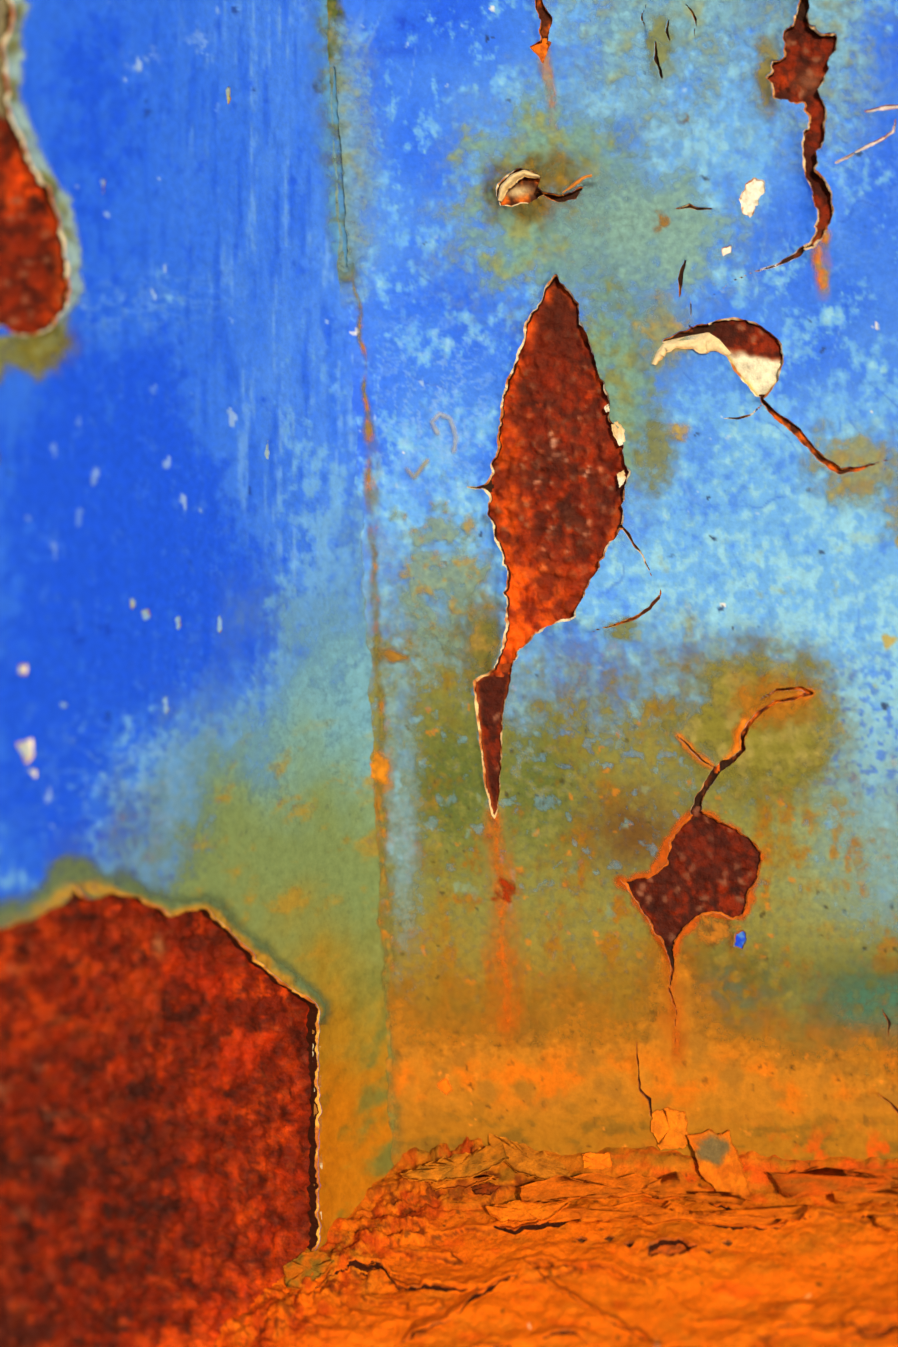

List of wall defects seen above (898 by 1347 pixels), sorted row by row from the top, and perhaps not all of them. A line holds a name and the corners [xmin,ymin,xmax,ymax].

crack [629,0,708,91]
peeling [0,0,88,337]
peeling [650,0,854,402]
rust [353,280,365,352]
rust [362,380,373,442]
rust [365,462,376,504]
peeling [462,270,650,819]
rust [370,534,898,1223]
peeling [0,869,323,1347]
crack [636,1042,652,1117]
crack [666,945,677,1043]
crack [261,1151,898,1347]